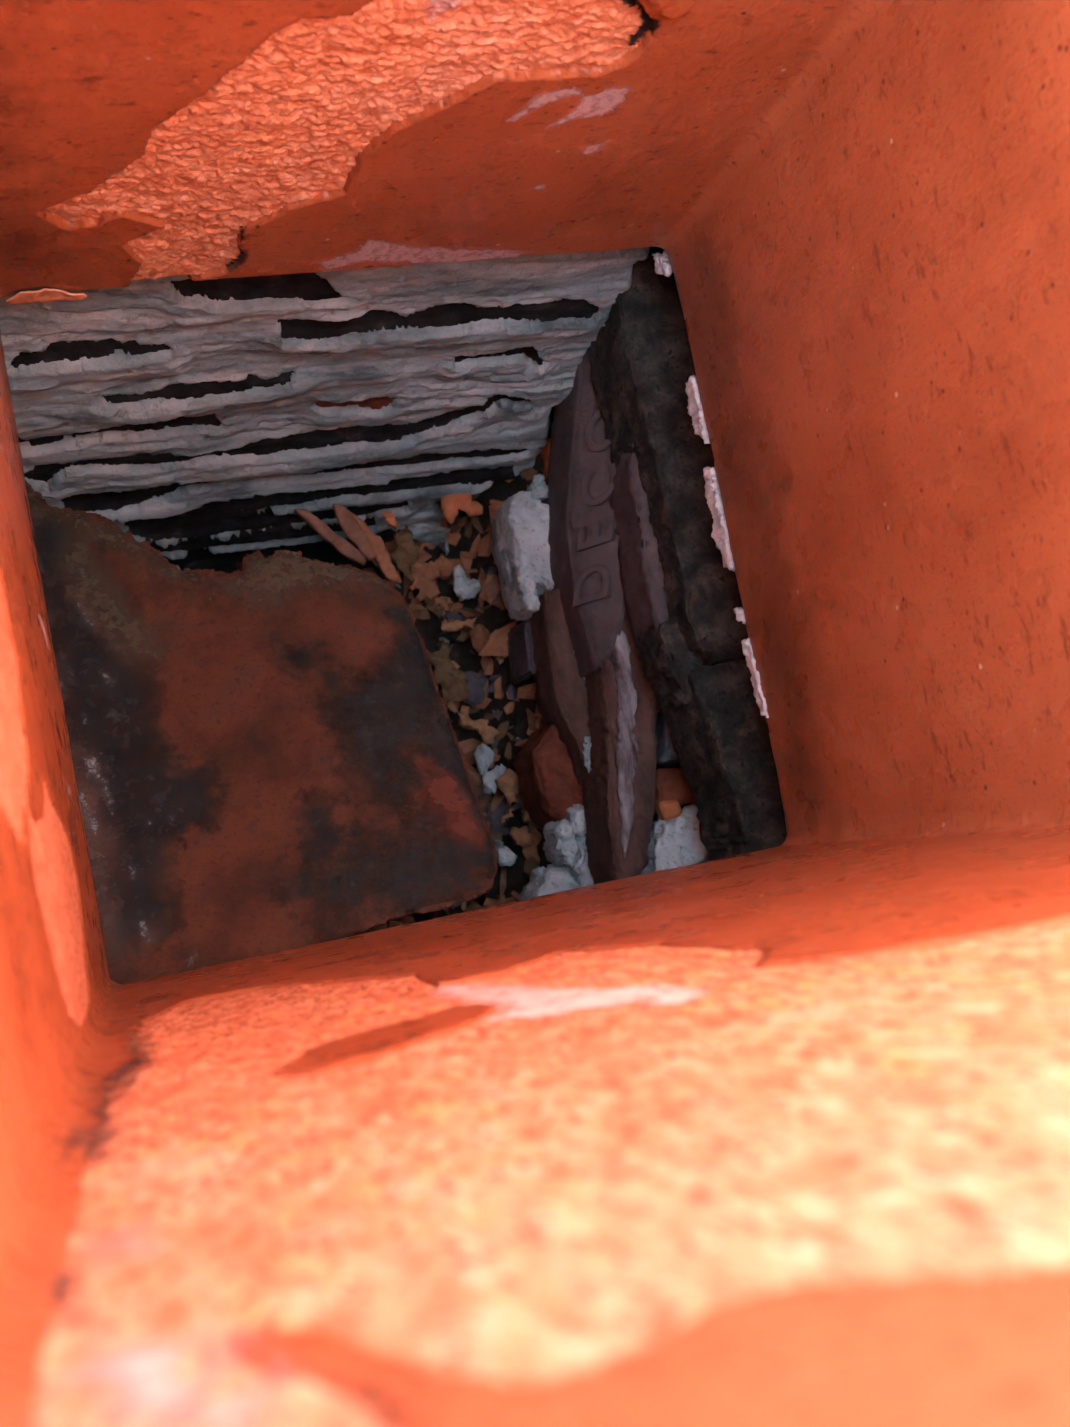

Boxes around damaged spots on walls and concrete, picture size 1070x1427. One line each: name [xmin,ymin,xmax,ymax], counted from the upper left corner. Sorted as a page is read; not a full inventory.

spalling [6,288,87,304]
spalling [44,0,696,280]
spalling [0,581,88,1026]
spalling [25,480,498,984]
spalling [28,921,1070,1427]